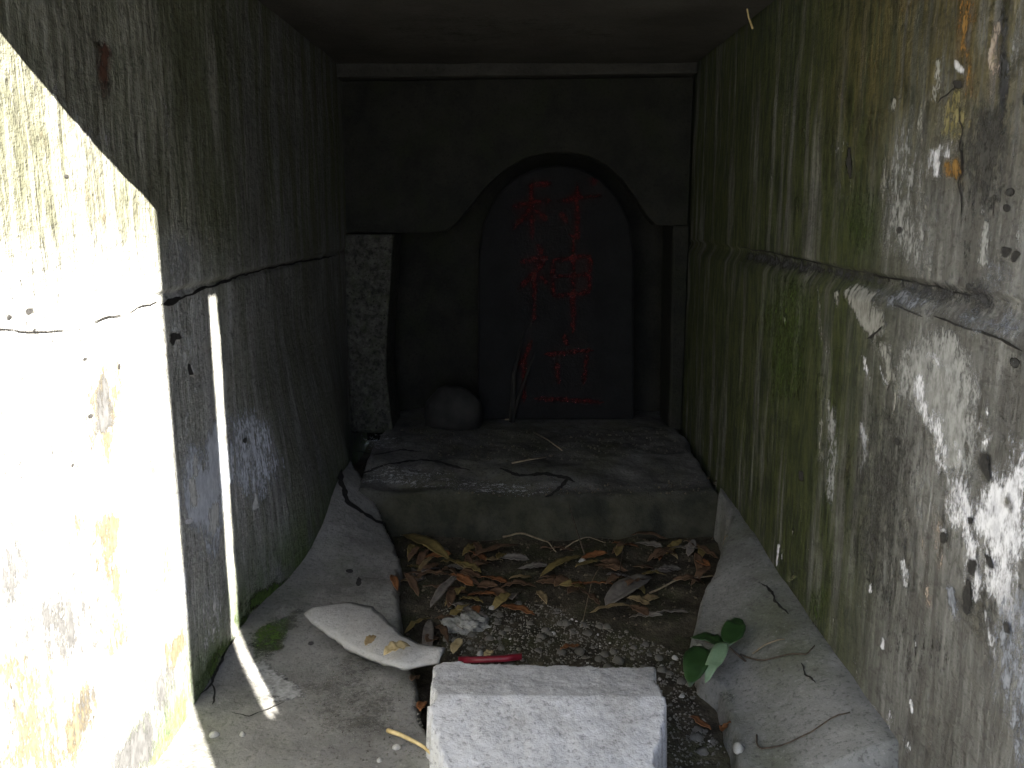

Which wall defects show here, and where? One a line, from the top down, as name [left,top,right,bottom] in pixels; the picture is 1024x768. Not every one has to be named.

crack [0,326,65,334]
crack [92,256,332,323]
peeling [834,283,898,411]
crack [740,247,1022,351]
leakage [178,408,284,650]
crack [337,449,469,545]
crack [500,468,575,497]
leakage [819,327,1024,768]
crack [758,582,789,614]